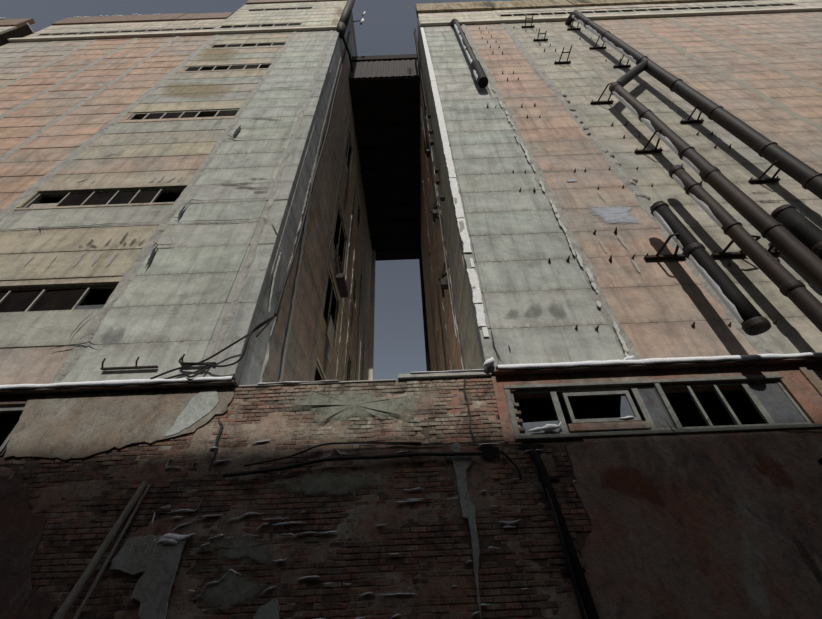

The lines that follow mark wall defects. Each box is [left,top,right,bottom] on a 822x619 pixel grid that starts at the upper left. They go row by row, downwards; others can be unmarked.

peeling [3,386,236,460]
peeling [292,391,415,422]
peeling [286,472,368,495]
peeling [445,442,481,619]
peeling [109,535,187,619]
peeling [253,599,280,619]